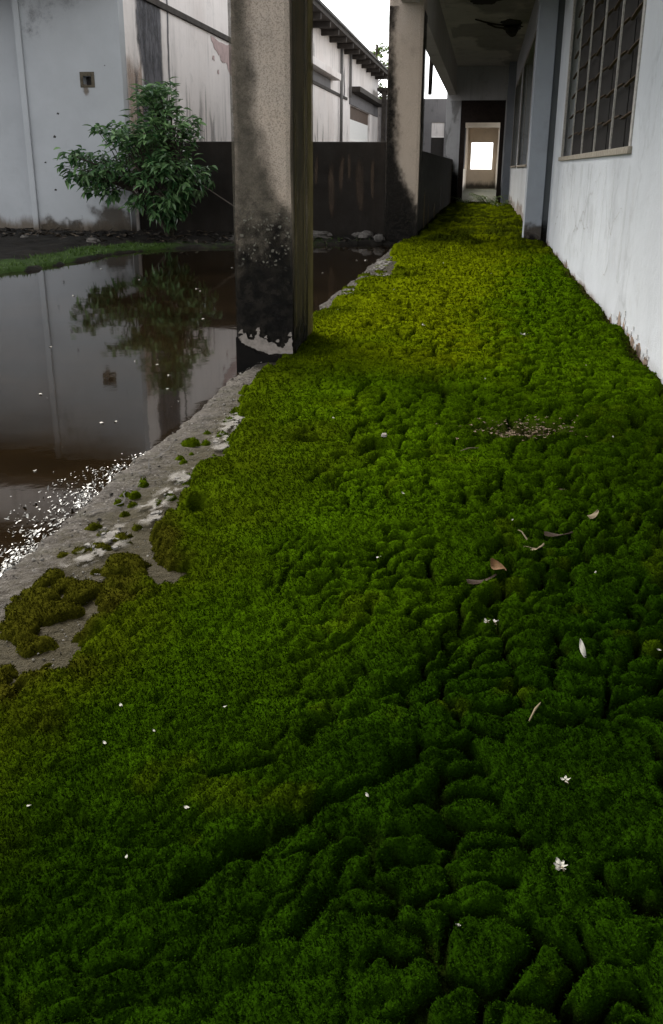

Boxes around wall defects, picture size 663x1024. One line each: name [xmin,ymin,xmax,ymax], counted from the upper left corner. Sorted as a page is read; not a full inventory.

spalling [238,327,293,355]
water stain [227,0,418,373]